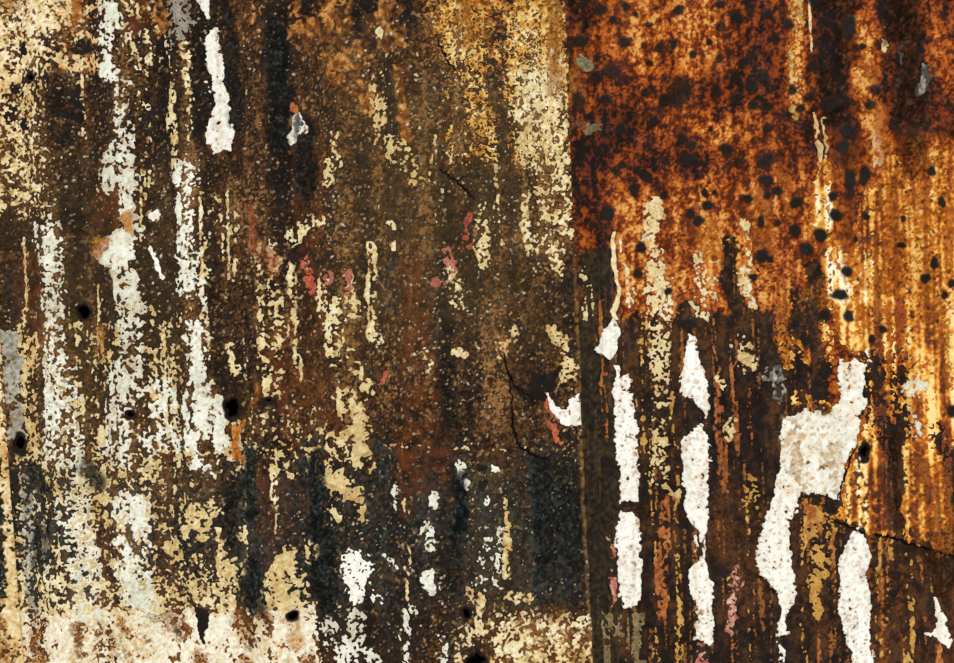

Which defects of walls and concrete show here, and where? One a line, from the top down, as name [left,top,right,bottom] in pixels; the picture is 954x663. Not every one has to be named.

peeling [369,0,620,314]
peeling [0,0,388,663]
crack [503,352,551,461]
corrosion [599,354,609,440]
peeling [437,0,954,663]
corrosion [712,318,753,502]
corrosion [843,255,869,327]
peeling [382,526,441,663]
peeling [420,521,436,552]
peeling [428,491,440,510]
corrosion [654,496,677,620]
corrosion [796,498,841,661]